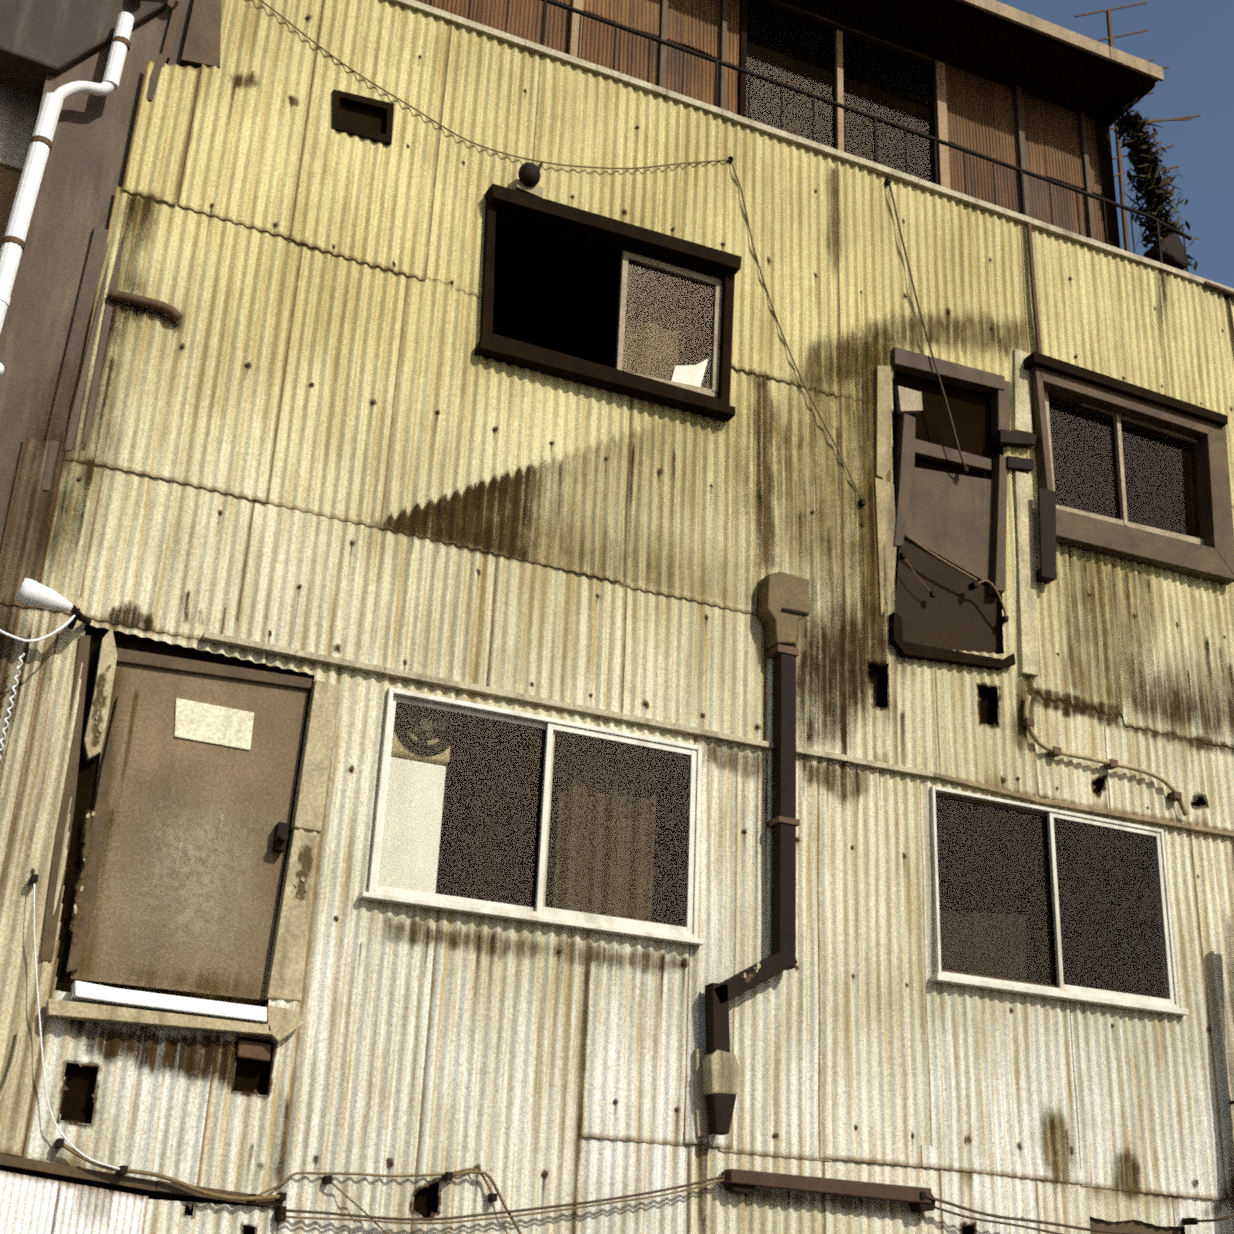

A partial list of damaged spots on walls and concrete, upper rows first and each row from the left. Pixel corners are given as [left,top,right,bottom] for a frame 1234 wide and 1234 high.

leakage [1206,639,1234,696]
rust [1116,1151,1141,1198]